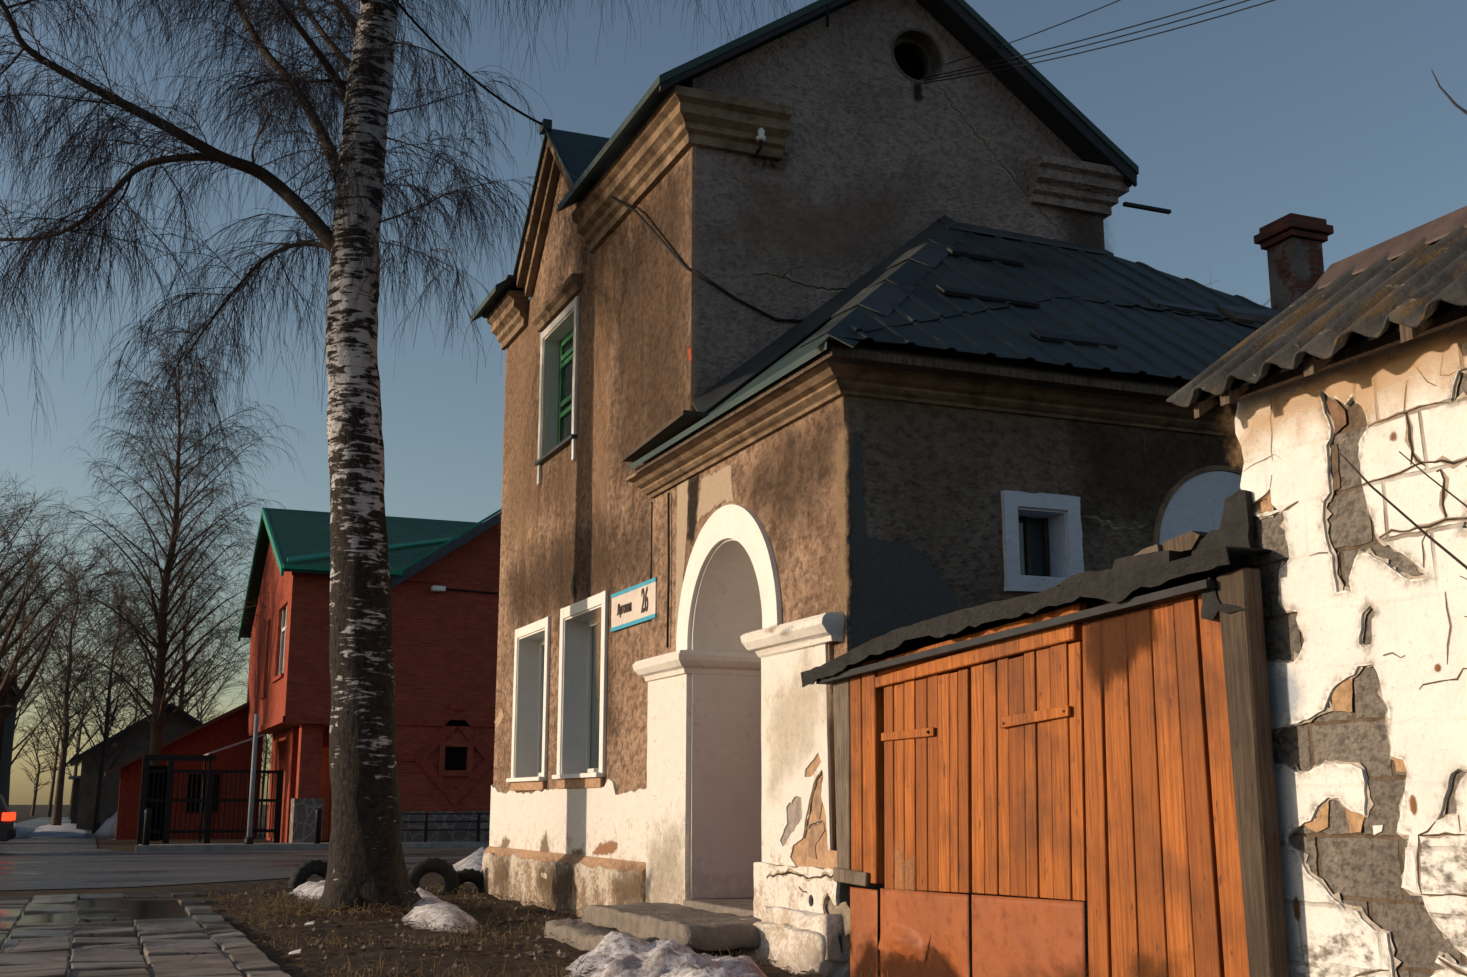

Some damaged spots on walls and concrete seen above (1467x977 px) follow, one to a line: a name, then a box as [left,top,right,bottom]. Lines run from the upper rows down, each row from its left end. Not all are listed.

crack [752,265,846,293]
spalling [1322,392,1428,592]
crack [1353,326,1467,690]
crack [766,770,833,914]
spalling [781,754,837,869]
spalling [1271,604,1467,977]